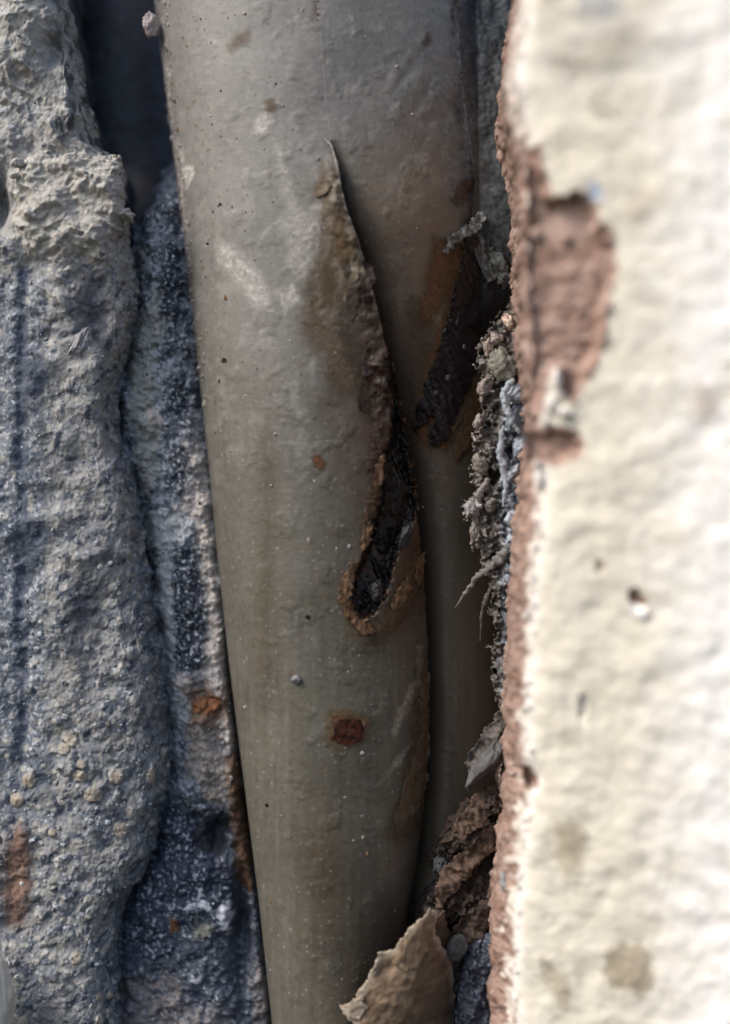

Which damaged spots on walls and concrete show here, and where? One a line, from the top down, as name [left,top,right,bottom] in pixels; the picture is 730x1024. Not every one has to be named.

corrosion [189,688,229,725]
corrosion [323,709,372,750]
spalling [522,764,539,791]
spalling [340,908,457,1024]